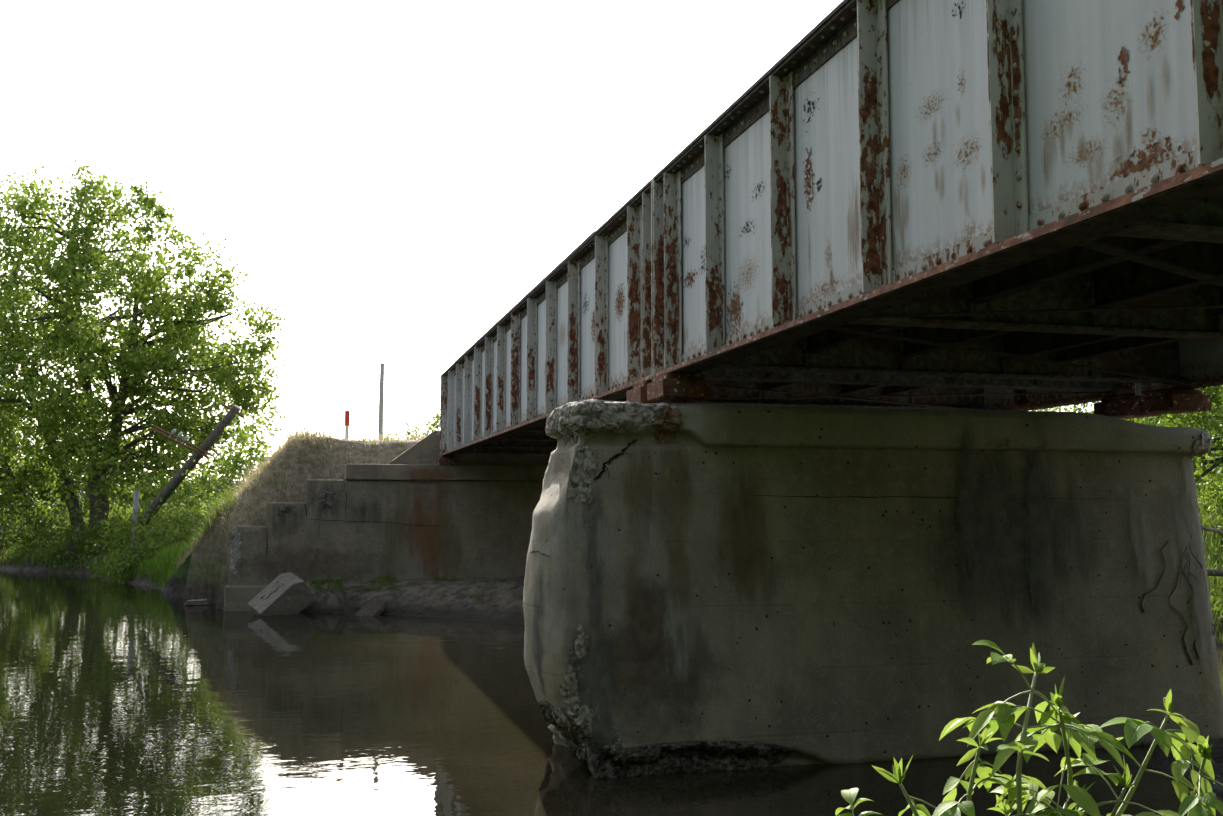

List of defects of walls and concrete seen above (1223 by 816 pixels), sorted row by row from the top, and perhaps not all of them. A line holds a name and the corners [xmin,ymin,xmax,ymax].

spalling [440,292,685,503]
damp [573,564,706,753]
spalling [538,624,791,779]